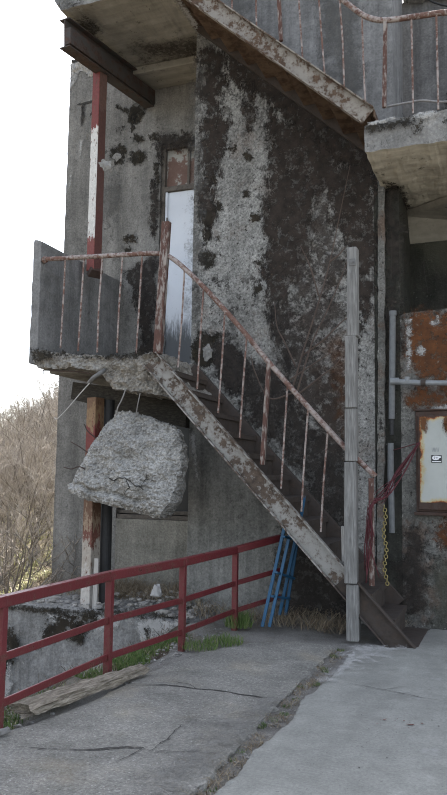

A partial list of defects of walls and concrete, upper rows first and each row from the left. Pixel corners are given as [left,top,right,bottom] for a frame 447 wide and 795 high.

damp [109,0,411,527]
rust [312,331,347,437]
rust [400,305,447,433]
crack [19,724,217,761]
crack [157,680,282,699]